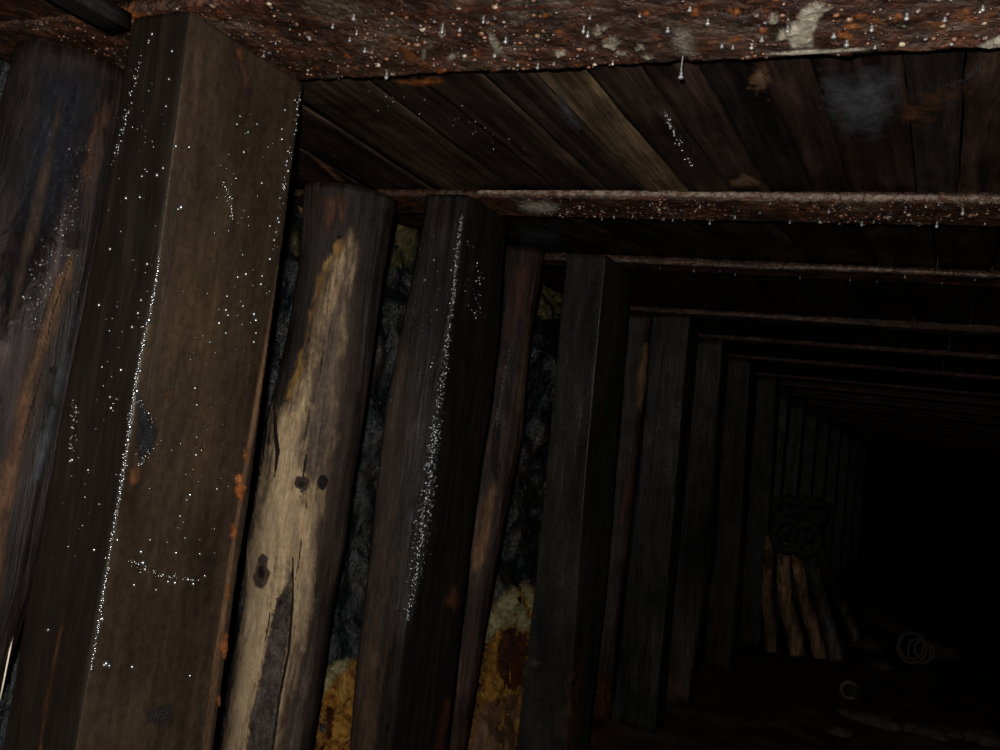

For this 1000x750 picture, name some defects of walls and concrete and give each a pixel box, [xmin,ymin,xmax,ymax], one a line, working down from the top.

rust [26,9,152,70]
rust [172,0,628,85]
rust [728,0,800,61]
damp [766,2,865,55]
rust [821,0,999,49]
damp [829,74,893,129]
rust [527,197,750,222]
rust [774,201,1000,226]
damp [89,45,202,671]
rust [202,285,275,750]
crack [265,503,307,750]